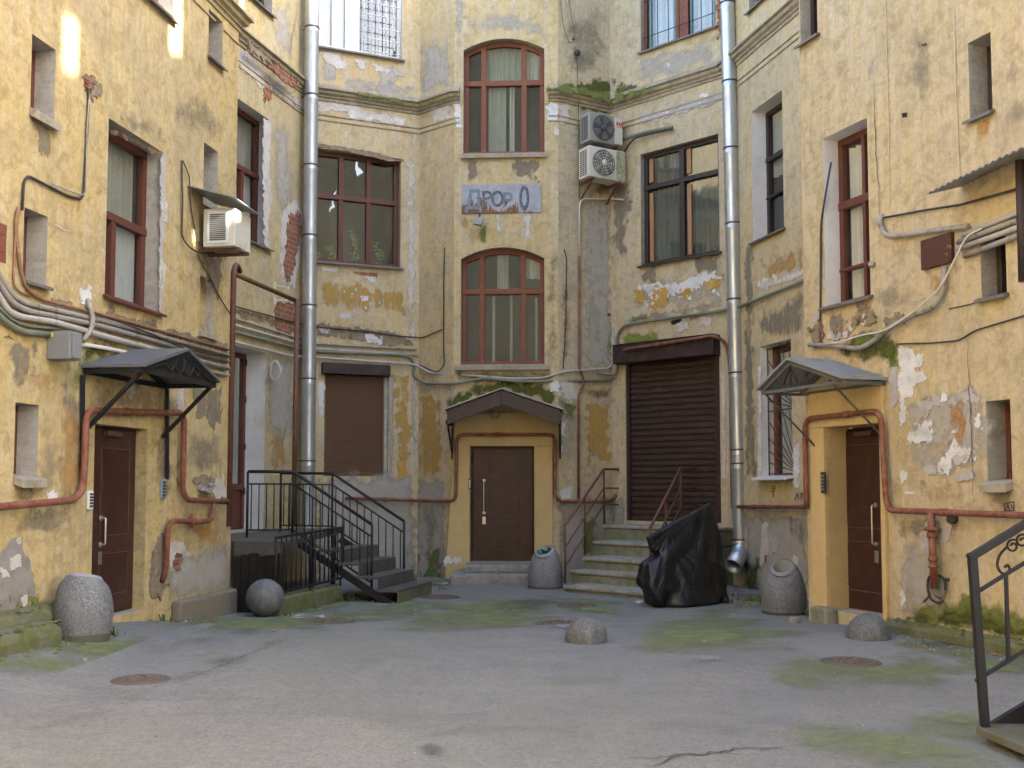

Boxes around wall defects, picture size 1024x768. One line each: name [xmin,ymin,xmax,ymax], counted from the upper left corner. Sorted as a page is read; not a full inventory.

peeling [238,40,301,110]
spalling [262,118,302,289]
spalling [316,271,413,347]
peeling [633,270,723,311]
spalling [827,309,905,341]
peeling [888,346,991,482]
spalling [192,473,227,505]
peeling [900,470,916,495]
peeling [0,537,36,612]
crack [631,747,781,766]